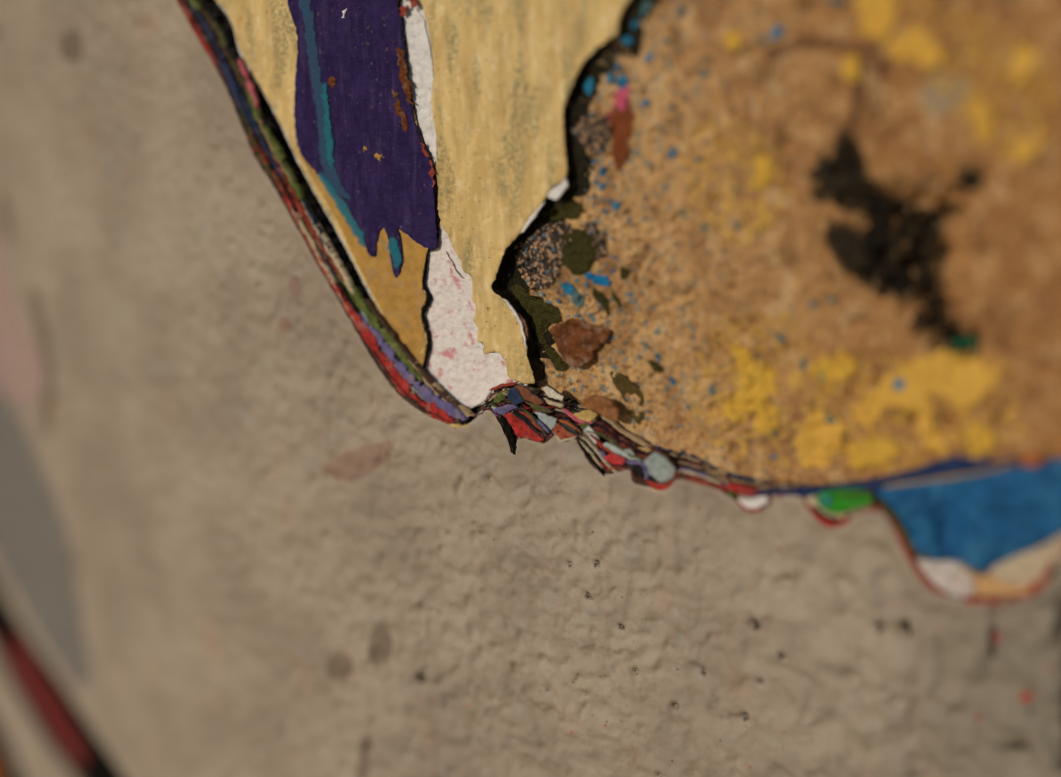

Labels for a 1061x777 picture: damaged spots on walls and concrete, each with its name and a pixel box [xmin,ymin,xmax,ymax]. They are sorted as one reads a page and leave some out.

peeling [177,0,1061,605]